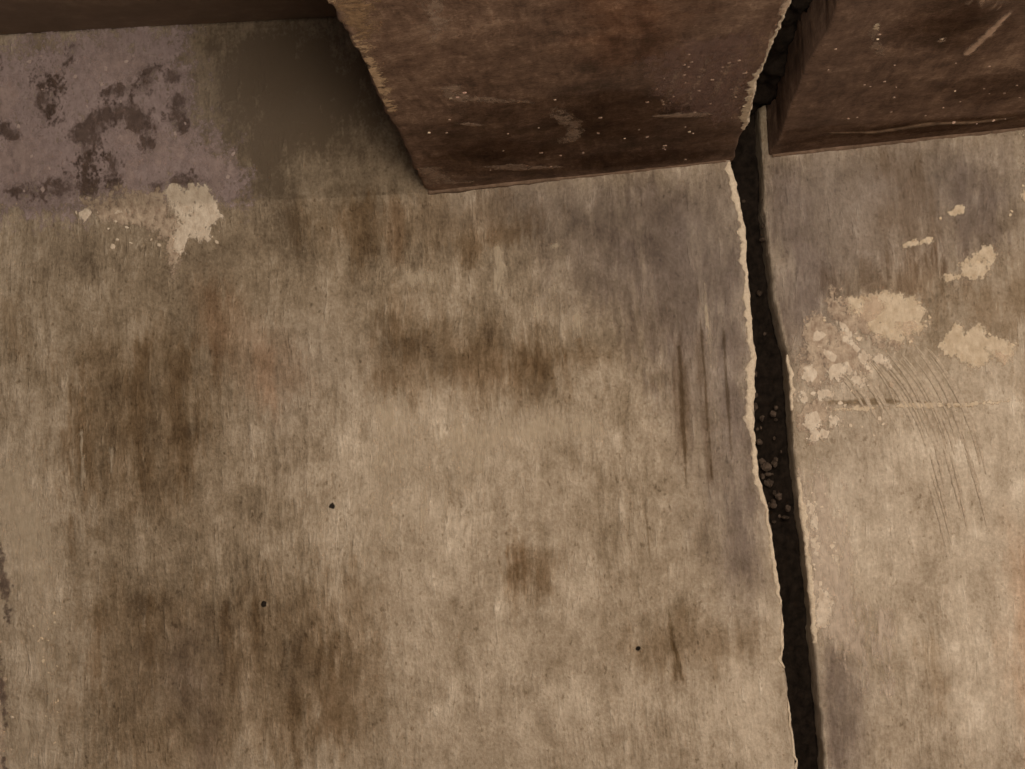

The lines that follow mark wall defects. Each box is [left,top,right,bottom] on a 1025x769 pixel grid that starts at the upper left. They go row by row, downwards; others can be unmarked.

crack [724,0,819,769]